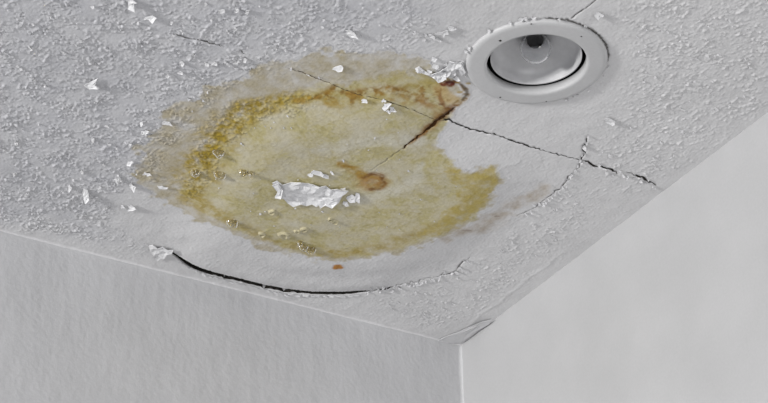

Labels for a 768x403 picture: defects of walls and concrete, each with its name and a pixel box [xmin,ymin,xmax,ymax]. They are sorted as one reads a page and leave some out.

peeling [415,46,470,83]
peeling [272,170,360,213]
leakage [126,46,557,270]
rust [336,161,391,192]
crack [282,66,656,217]
peeling [144,243,173,262]
crack [172,252,471,298]